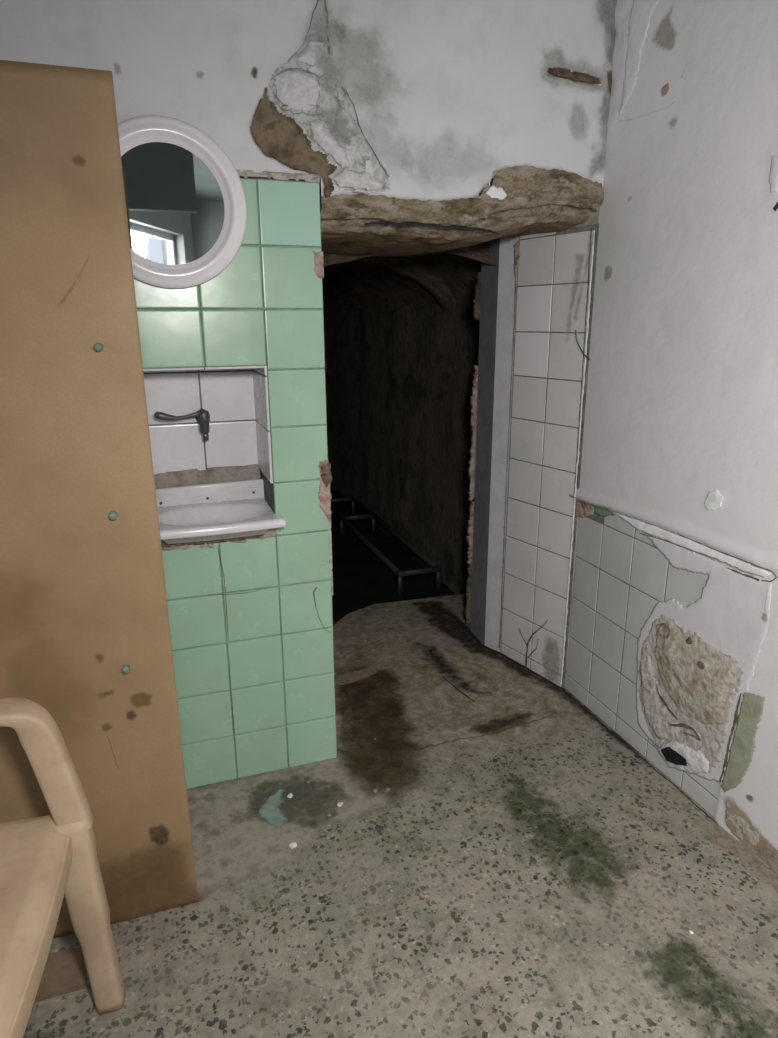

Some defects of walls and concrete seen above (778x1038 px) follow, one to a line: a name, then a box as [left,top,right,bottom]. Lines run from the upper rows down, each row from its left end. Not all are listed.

crack [305,0,342,59]
leakage [601,0,617,65]
crack [346,91,389,176]
flaking render [250,32,604,241]
leakage [545,53,611,134]
corrosion [548,67,612,93]
flaking render [617,514,772,782]
leakage [339,667,420,795]